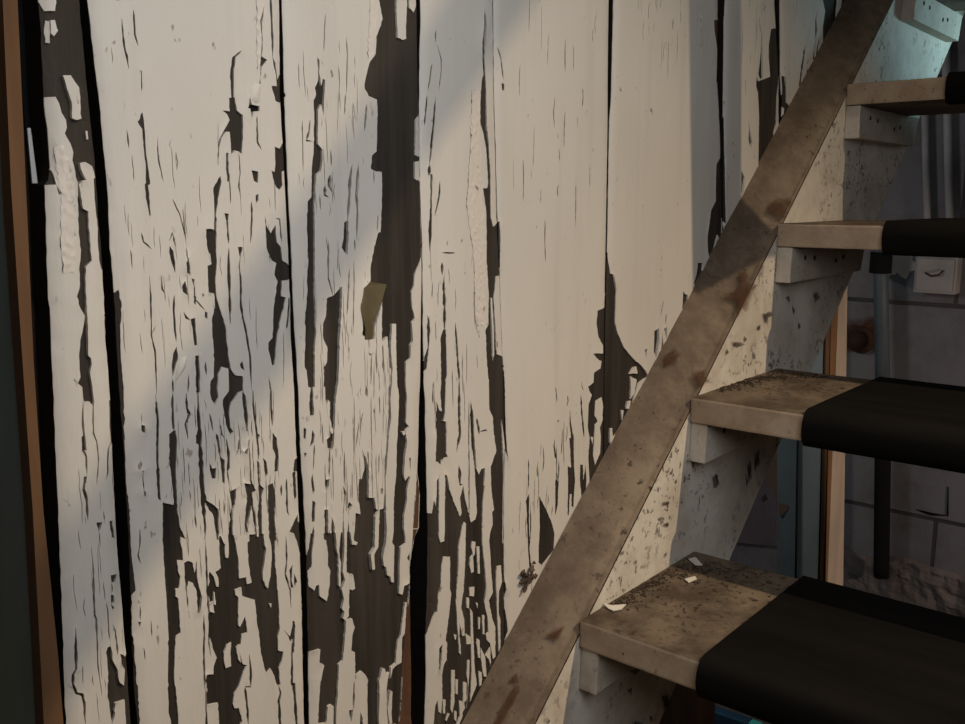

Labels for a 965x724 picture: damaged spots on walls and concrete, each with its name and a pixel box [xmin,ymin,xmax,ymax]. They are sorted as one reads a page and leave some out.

peeling [38,0,102,404]
peeling [162,0,508,724]
peeling [555,259,646,515]
peeling [728,279,756,315]